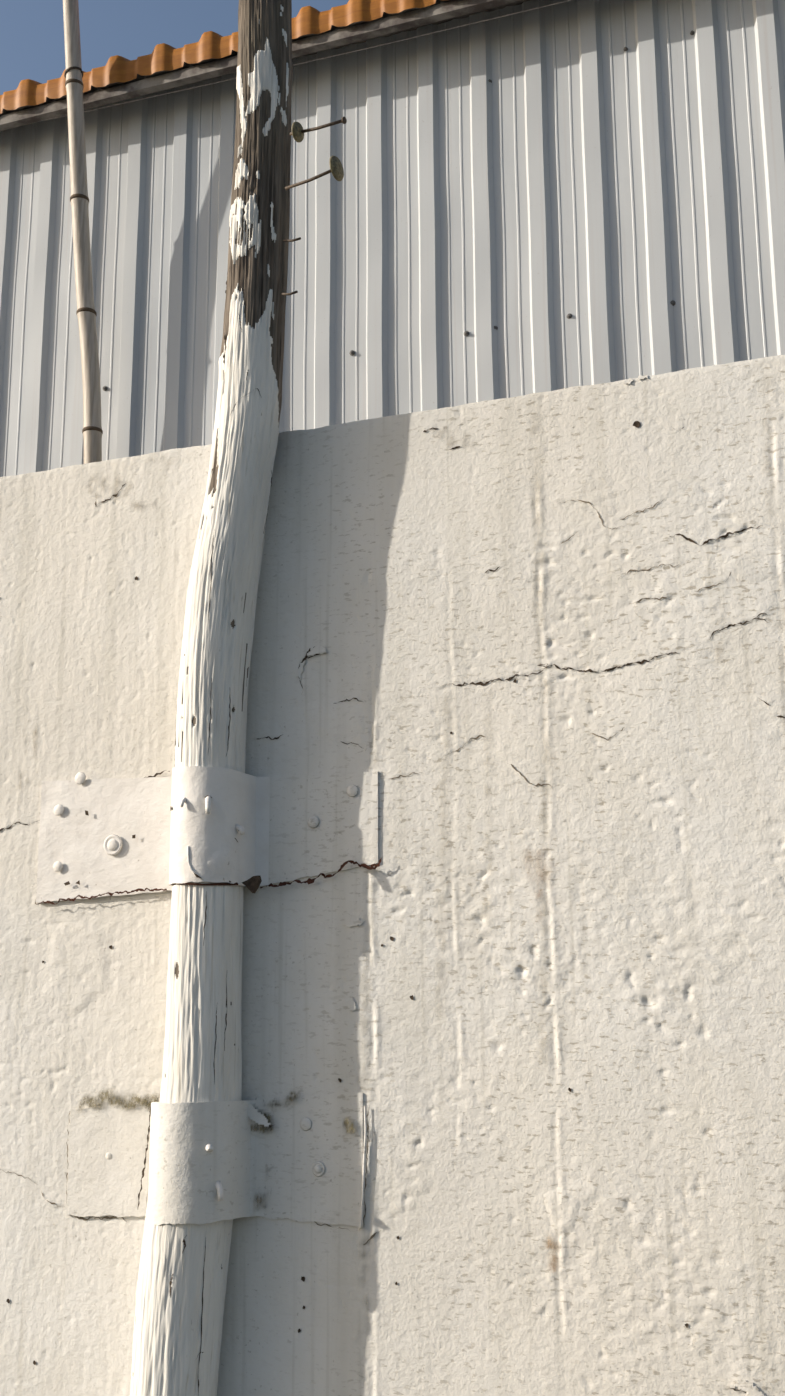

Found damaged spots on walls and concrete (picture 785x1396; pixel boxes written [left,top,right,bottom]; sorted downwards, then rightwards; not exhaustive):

peeling [229,5,289,277]
crack [557,500,662,543]
crack [627,526,760,609]
crack [442,613,766,686]